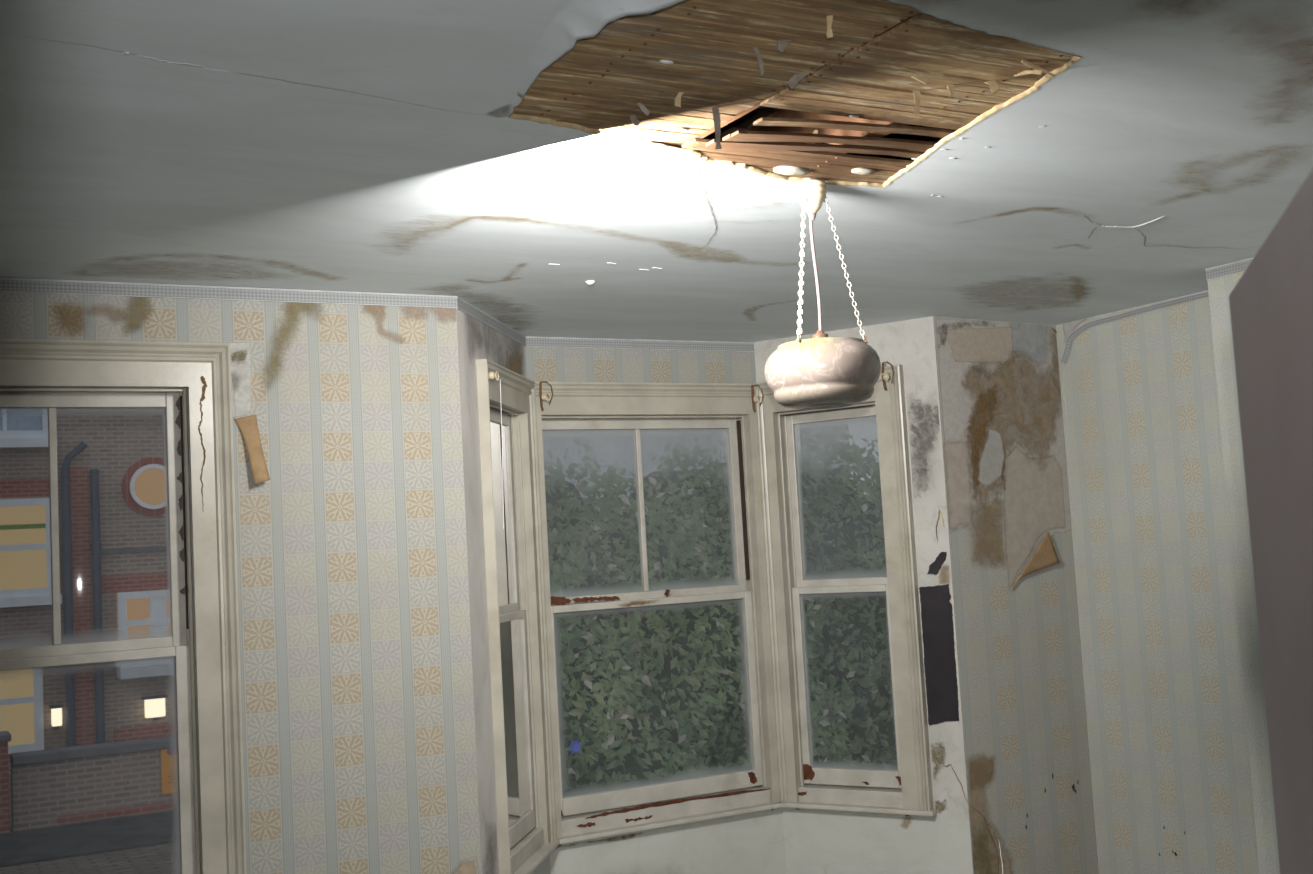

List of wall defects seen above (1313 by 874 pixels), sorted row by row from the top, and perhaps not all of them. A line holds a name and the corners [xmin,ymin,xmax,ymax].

crack [26,36,482,115]
flaking render [508,0,1081,187]
crack [681,163,717,250]
leakage [59,297,148,329]
leakage [267,302,314,377]
leakage [367,305,402,342]
leakage [406,282,521,375]
crack [198,376,207,512]
leakage [911,405,939,473]
flaking render [936,290,1209,588]
leakage [969,757,1012,874]